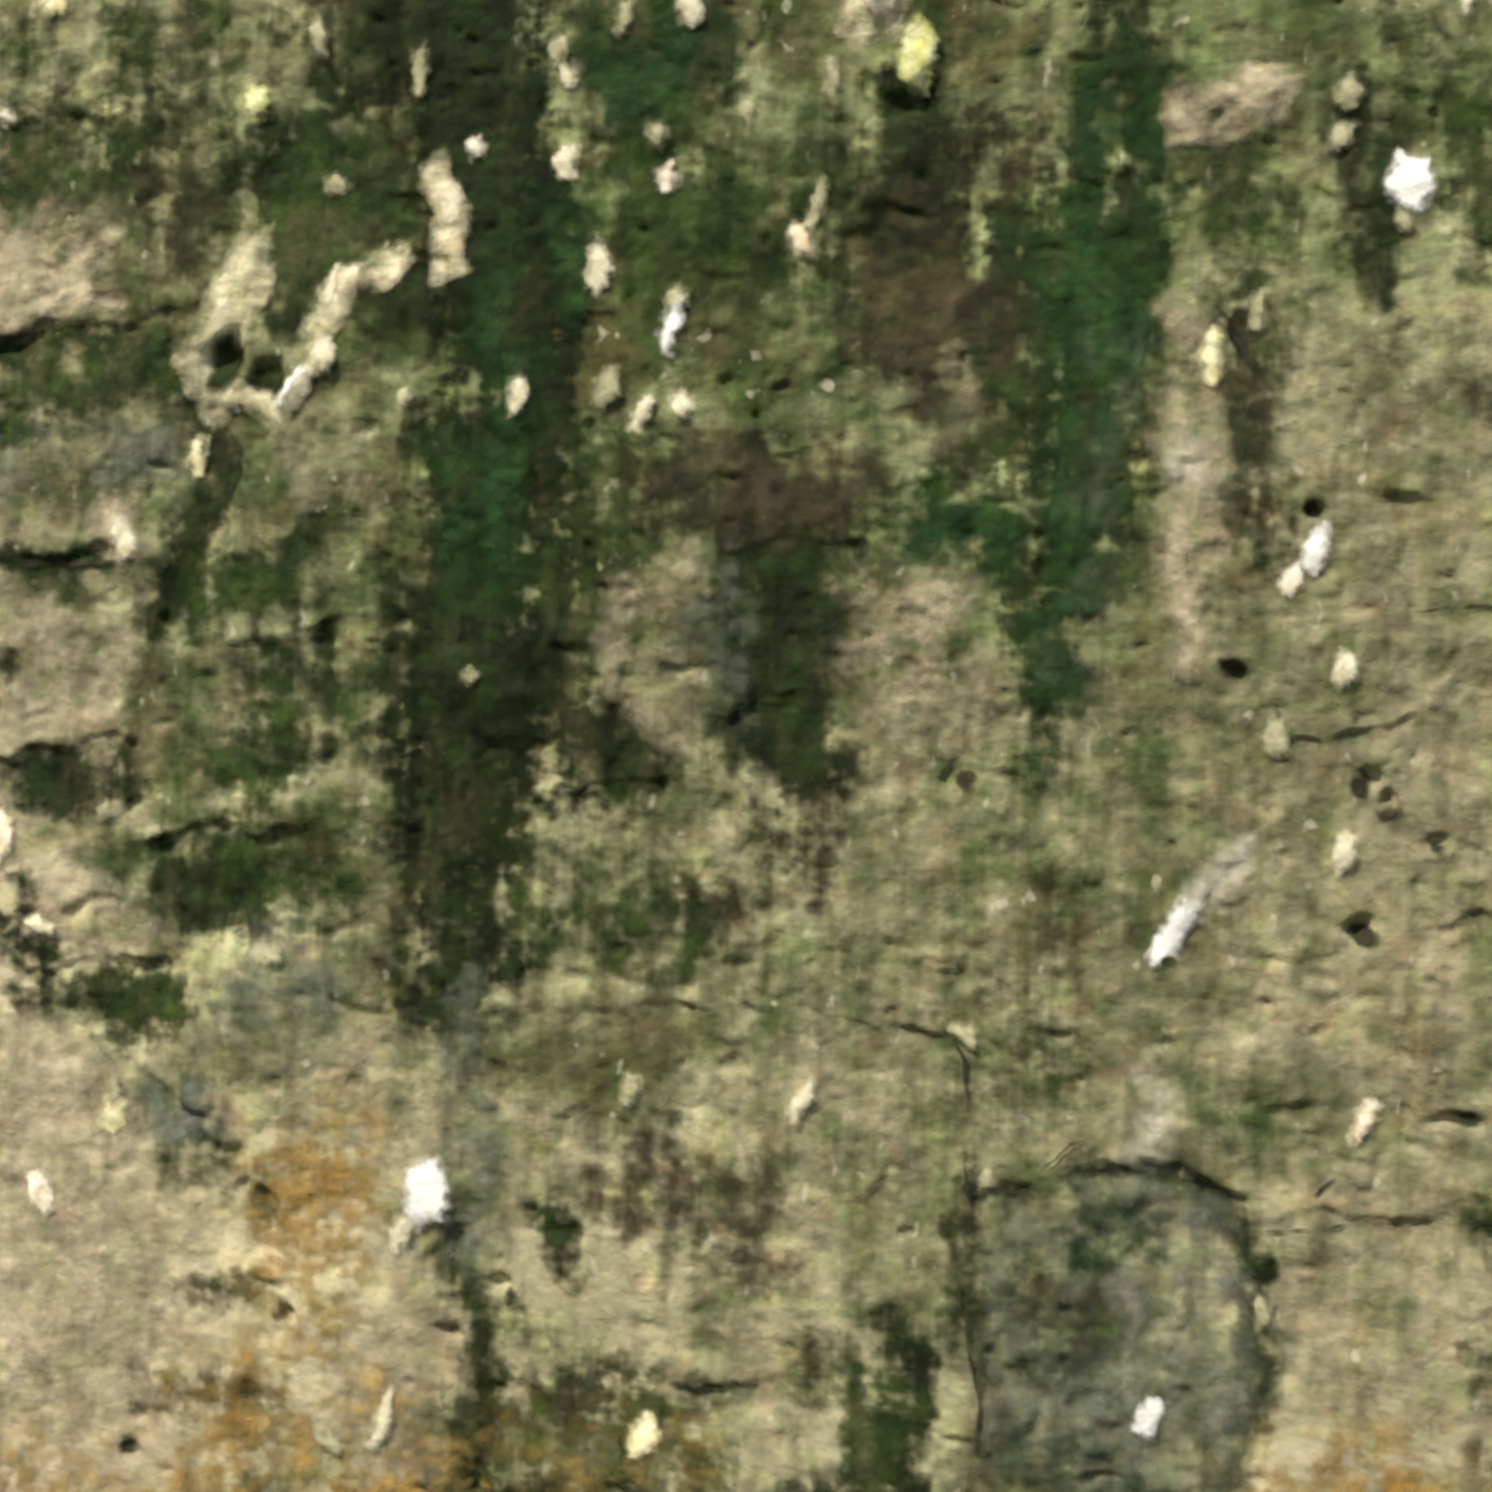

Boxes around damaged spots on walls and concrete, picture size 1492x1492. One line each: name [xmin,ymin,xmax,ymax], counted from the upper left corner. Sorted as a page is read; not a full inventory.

flaking render [309,20,327,56]
flaking render [412,47,427,95]
peeling [1163,64,1301,144]
spalling [177,74,467,476]
peeling [1156,305,1226,670]
damp [136,0,1185,1165]
corrosion [264,1143,388,1249]
damp [529,1115,785,1281]
damp [939,1166,983,1262]
damp [787,1290,1015,1492]